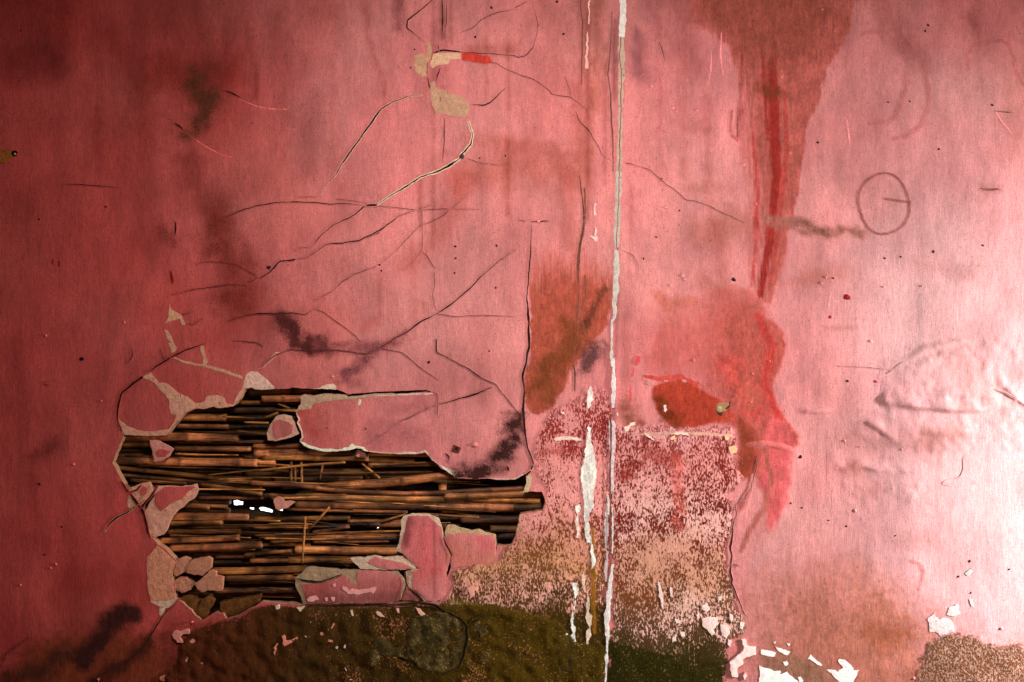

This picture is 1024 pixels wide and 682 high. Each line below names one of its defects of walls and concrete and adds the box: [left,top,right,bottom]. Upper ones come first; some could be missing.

flaking render [410,42,469,118]
water stain [693,0,865,552]
crack [116,0,746,682]
flaking render [267,384,455,476]
flaking render [274,496,295,511]
flaking render [488,474,532,493]
water stain [6,628,187,682]
flaking render [147,545,177,616]
peeling [296,583,377,612]
peeling [696,595,803,682]
peeling [807,655,859,682]
peeling [928,592,974,637]